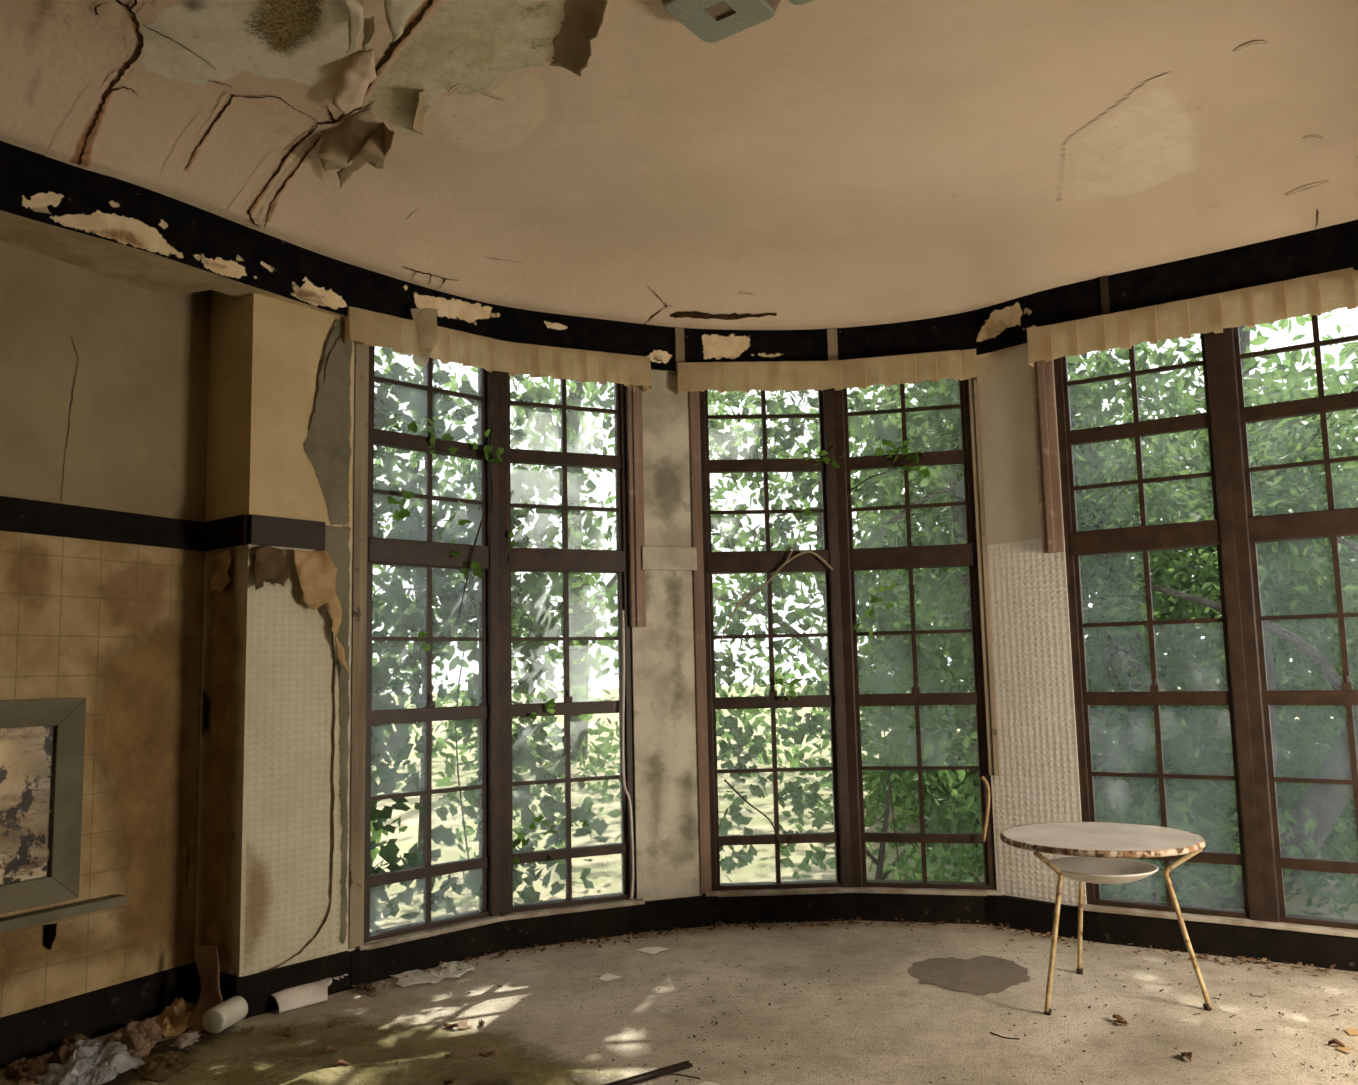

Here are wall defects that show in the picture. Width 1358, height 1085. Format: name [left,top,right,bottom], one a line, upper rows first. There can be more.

mould [247,0,324,50]
crack [79,0,433,228]
peeling [122,0,608,188]
peeling [22,192,274,279]
peeling [544,320,568,330]
peeling [647,350,673,364]
peeling [702,333,783,360]
peeling [977,302,1037,342]
peeling [238,277,352,978]
water stain [99,554,239,965]
water stain [0,934,94,976]